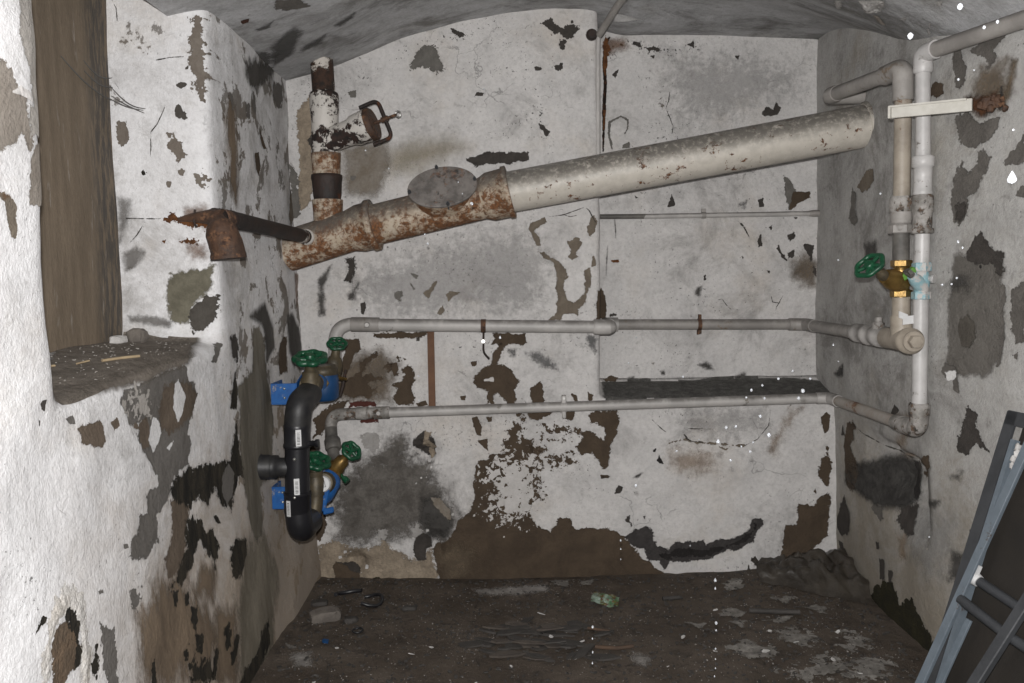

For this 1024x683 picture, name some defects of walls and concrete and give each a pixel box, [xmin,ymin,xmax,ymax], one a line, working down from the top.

peeling [174,104,188,120]
peeling [176,15,221,103]
rust [966,62,1007,117]
damp [1003,60,1017,104]
rust [163,209,208,256]
peeling [529,215,617,320]
peeling [39,354,198,561]
damp [316,432,461,546]
peeling [310,331,764,579]
peeling [780,446,833,557]